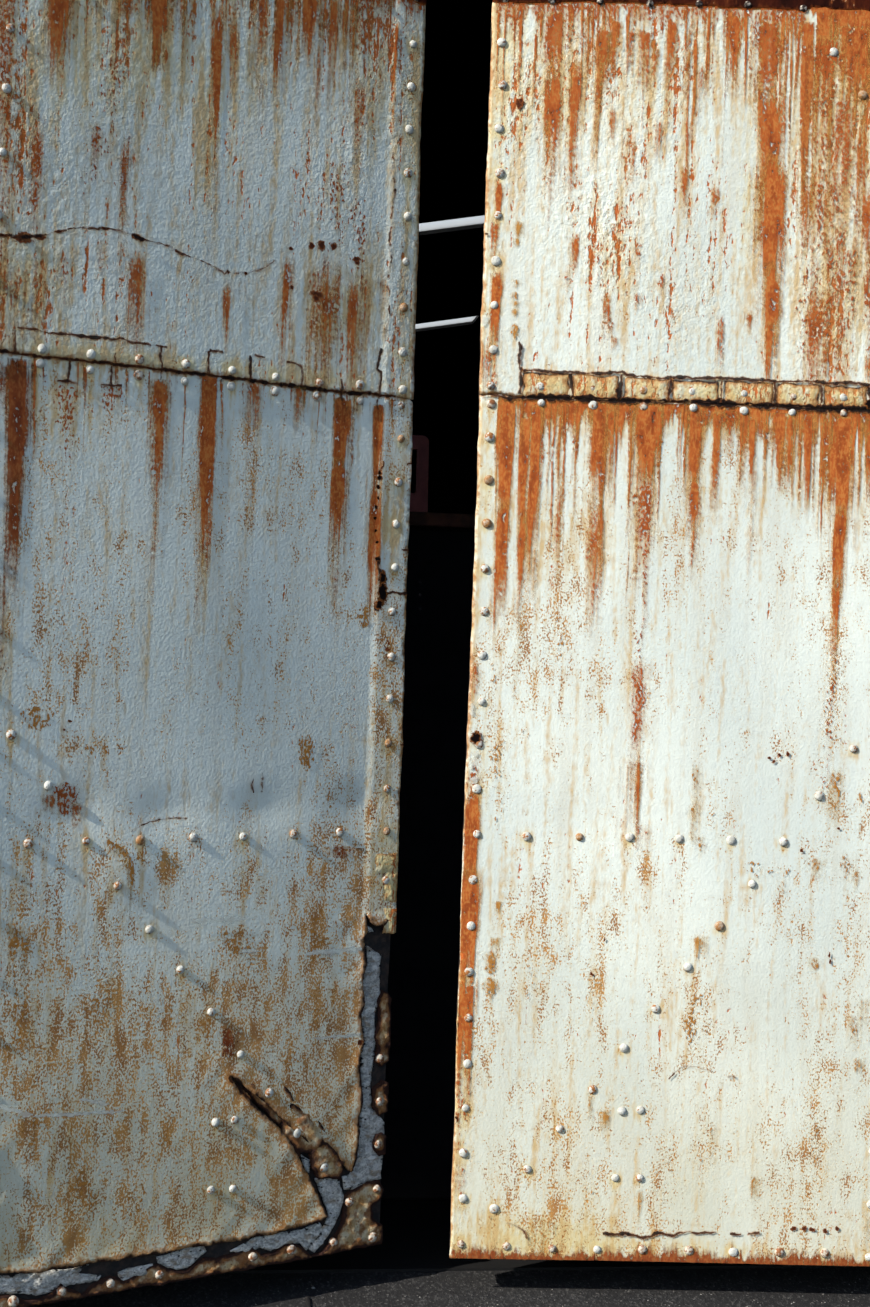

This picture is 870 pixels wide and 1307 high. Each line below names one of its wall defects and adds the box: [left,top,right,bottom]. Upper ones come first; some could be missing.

rust [147,372,223,568]
crack [0,156,396,410]
rust [211,0,425,628]
crack [374,548,408,611]
crack [481,341,870,414]
rust [481,272,870,868]
rust [496,1,870,389]
peeling [230,926,385,1252]
rust [453,739,511,1195]
peeling [0,1264,101,1296]
peeling [118,1246,206,1281]
crack [603,1231,760,1239]